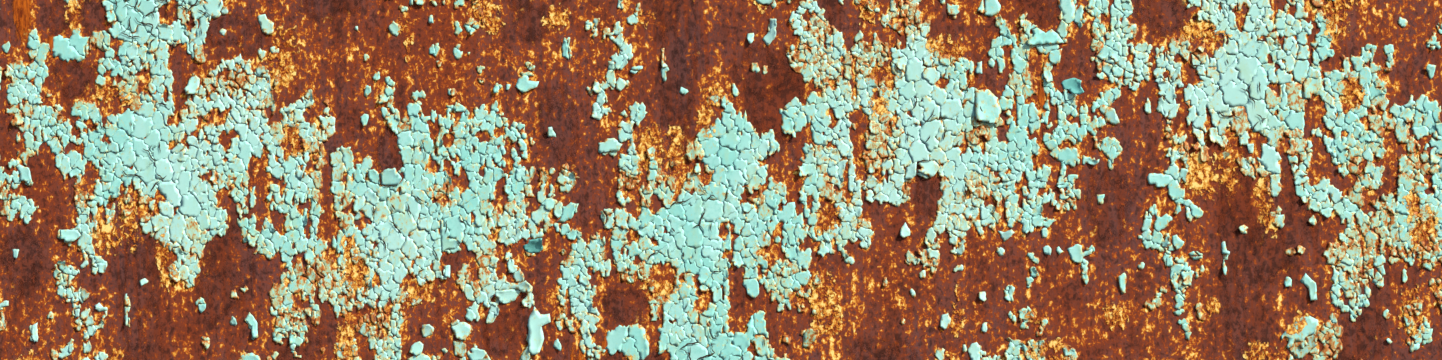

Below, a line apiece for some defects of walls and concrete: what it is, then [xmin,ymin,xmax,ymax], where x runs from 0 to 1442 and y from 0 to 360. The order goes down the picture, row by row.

crack [115,0,221,78]
rust [89,198,139,256]
crack [373,173,466,258]
rust [635,85,724,177]
crack [648,183,721,273]
crack [1191,60,1267,132]
rust [1184,143,1278,238]
peeling [1138,0,1442,340]
rust [808,270,843,336]
rust [1243,310,1309,360]
peeling [1281,313,1343,360]
peeling [1382,295,1433,352]